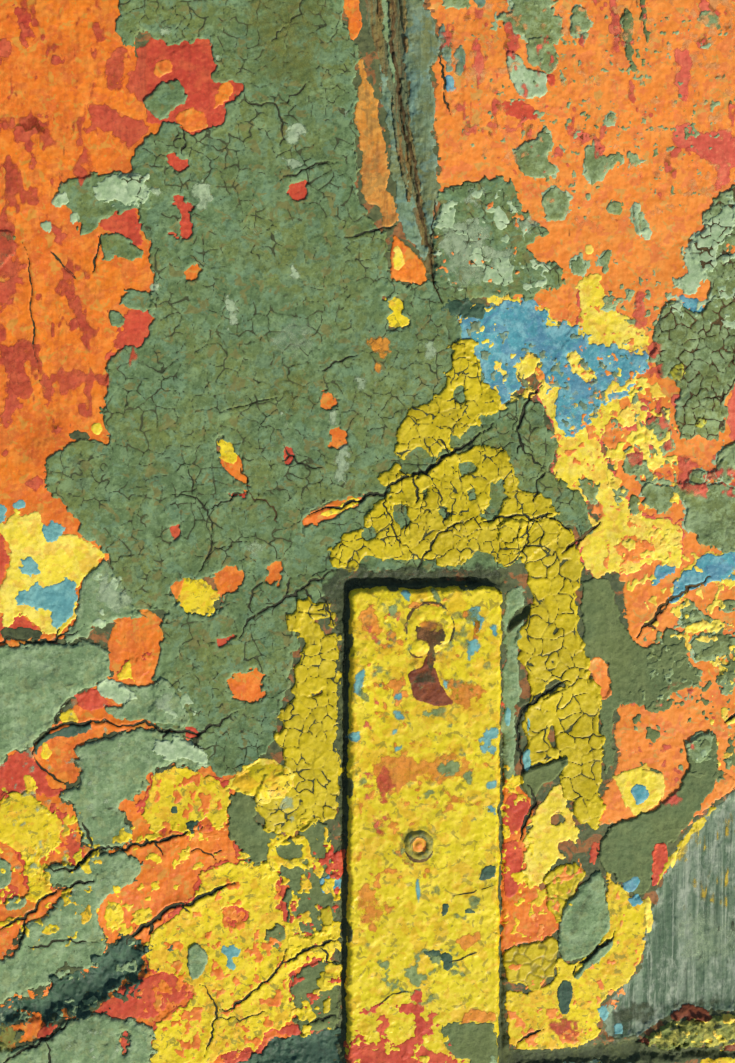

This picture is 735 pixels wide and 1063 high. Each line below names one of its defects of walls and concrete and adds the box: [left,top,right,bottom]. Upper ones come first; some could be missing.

peeling [153,59,173,78]
crack [655,187,735,439]
crack [22,0,602,840]
spalling [459,574,505,591]
peeling [456,606,486,661]
peeling [422,708,452,738]
peeling [479,728,499,759]
crack [0,822,235,949]
peeling [370,849,440,900]
peeling [441,896,480,920]
crack [202,938,341,1057]
crack [4,1021,68,1063]